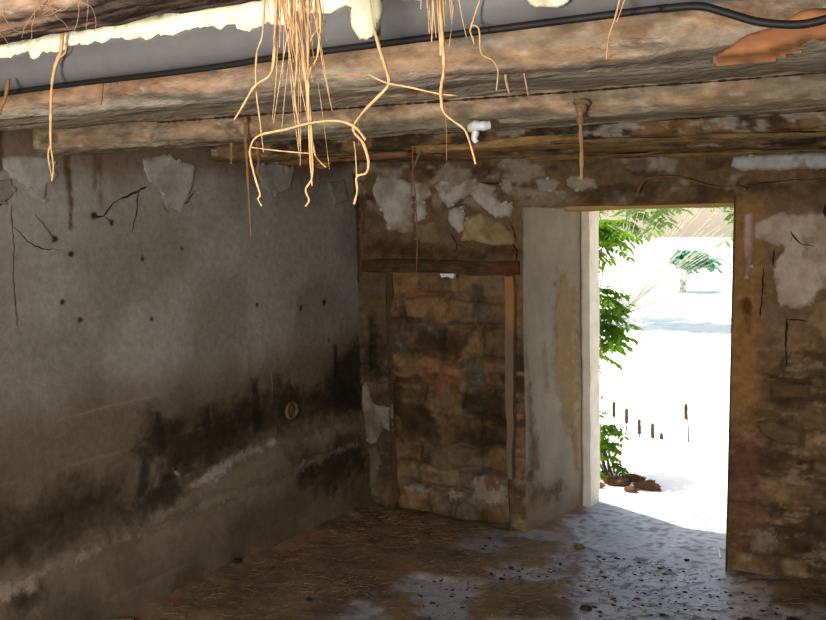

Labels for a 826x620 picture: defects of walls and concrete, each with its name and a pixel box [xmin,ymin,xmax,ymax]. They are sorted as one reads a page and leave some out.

peeling [0,155,57,205]
crack [94,186,148,231]
peeling [143,154,196,213]
peeling [256,162,295,197]
flaking render [372,173,514,246]
crack [0,199,60,316]
flaking render [743,211,826,309]
crack [759,230,813,316]
crack [785,318,809,365]
flaking render [362,382,394,487]
leakage [0,336,380,608]